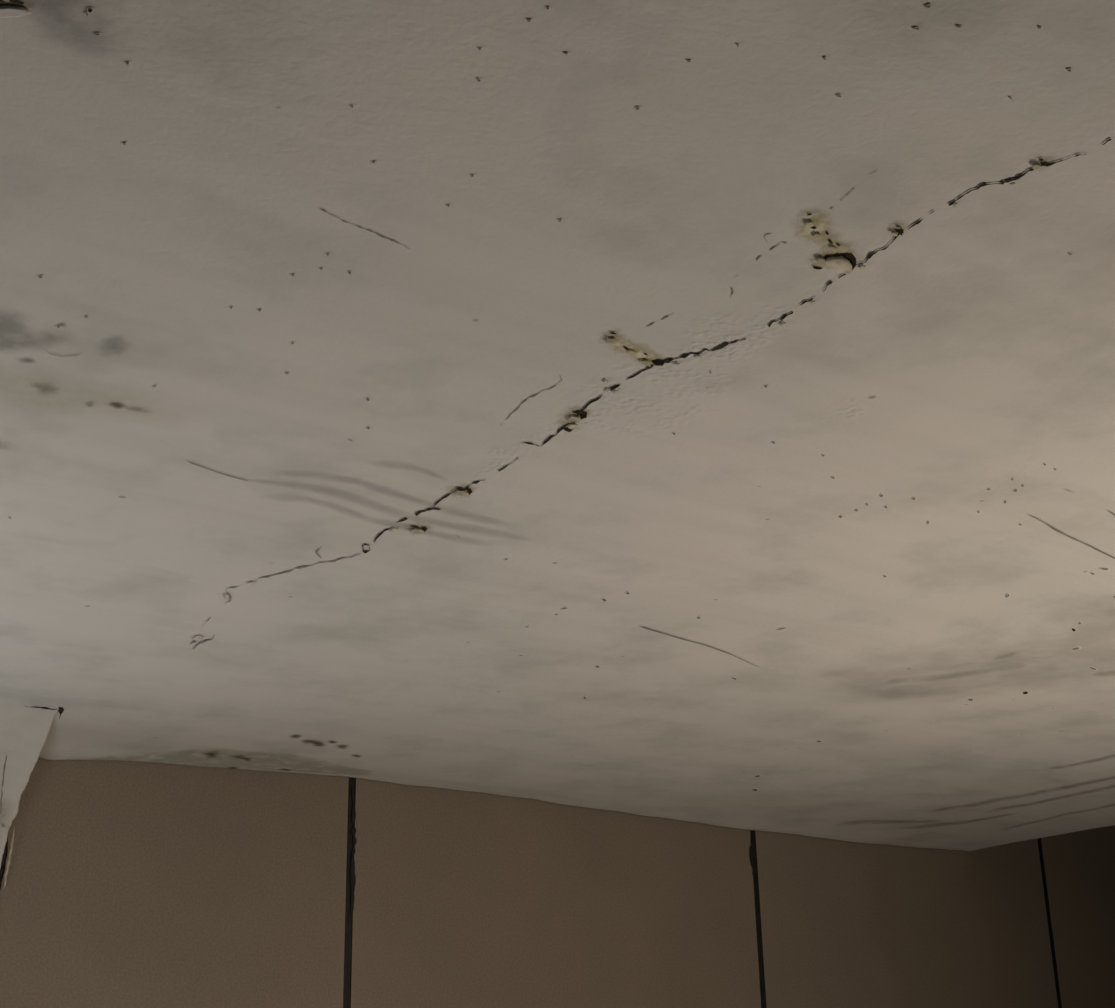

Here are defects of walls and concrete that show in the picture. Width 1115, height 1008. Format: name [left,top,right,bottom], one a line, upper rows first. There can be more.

spalling [799,212,856,275]
spalling [604,332,665,367]
crack [190,139,1111,649]
crack [25,706,64,719]
crack [0,756,8,813]